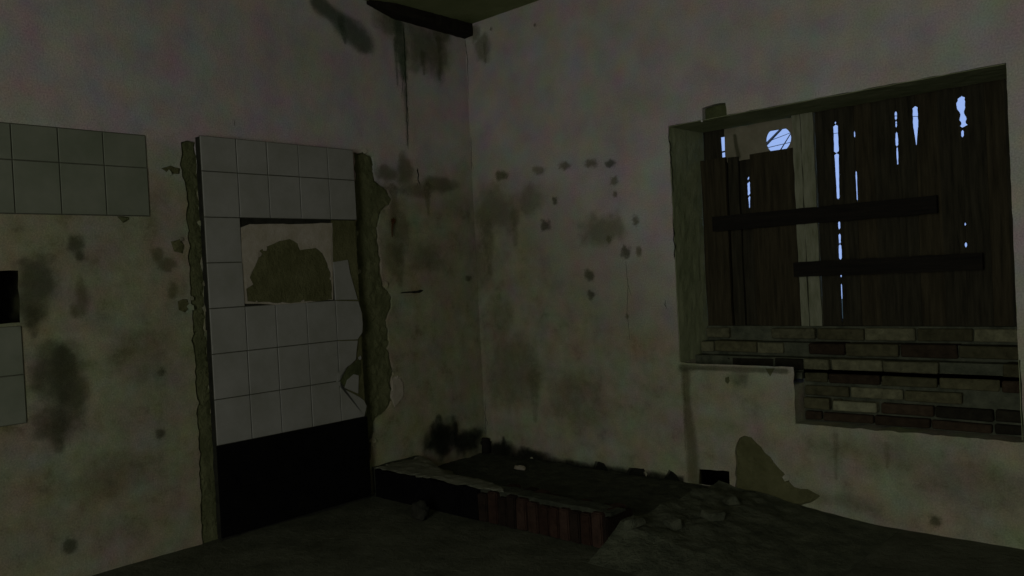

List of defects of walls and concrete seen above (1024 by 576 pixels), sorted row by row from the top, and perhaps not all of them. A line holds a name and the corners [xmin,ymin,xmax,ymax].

water stain [312,0,370,51]
flaking render [246,148,404,456]
flaking render [162,141,218,543]
water stain [424,416,683,482]
flaking render [736,436,820,505]